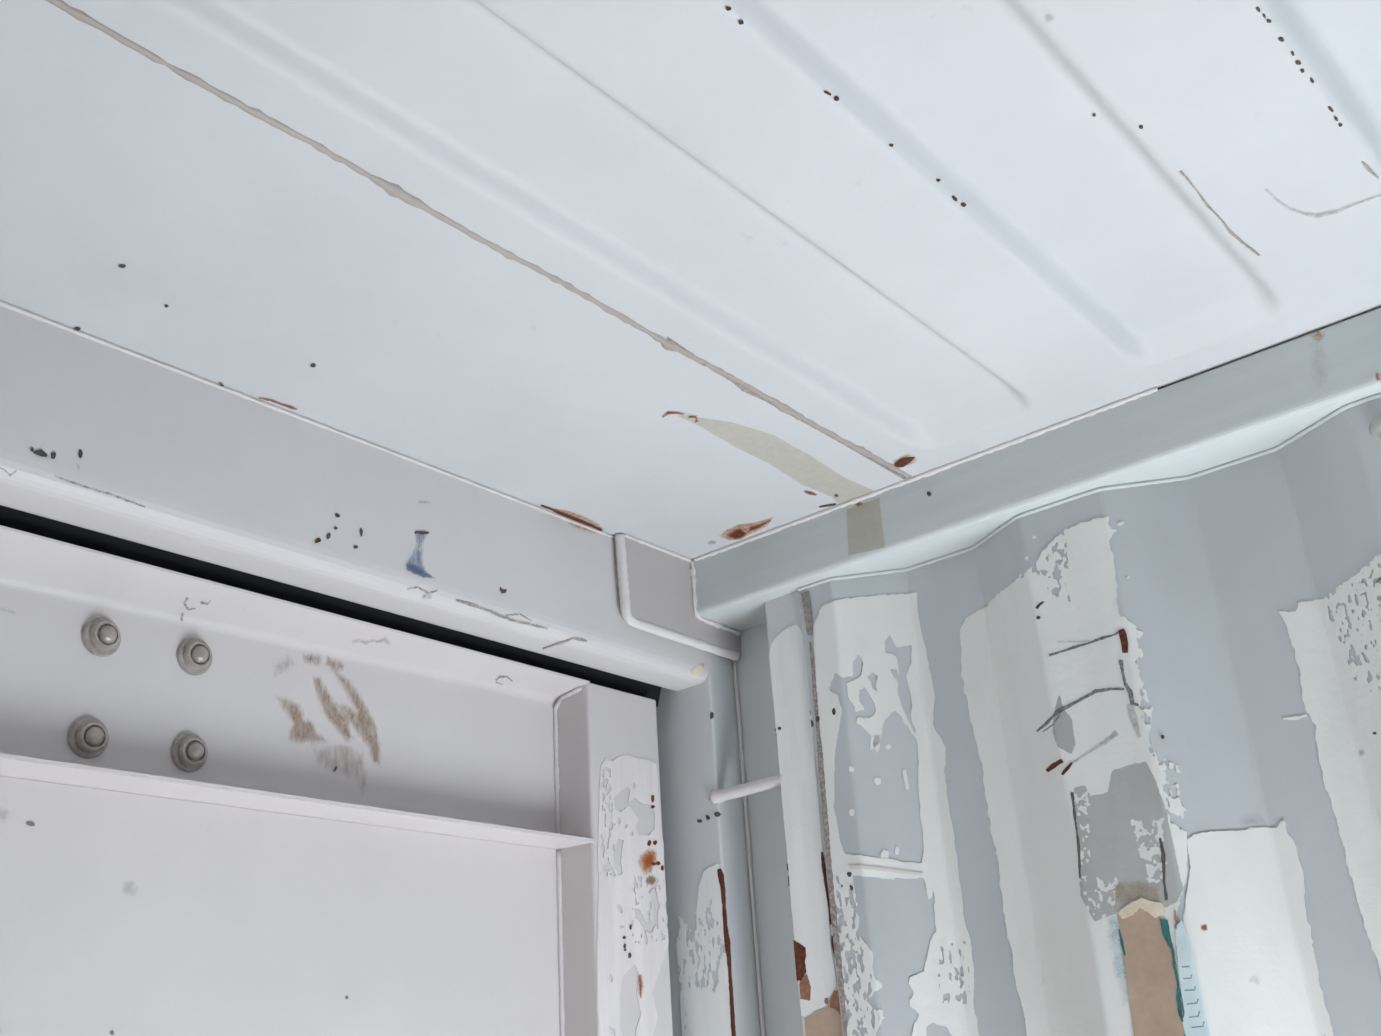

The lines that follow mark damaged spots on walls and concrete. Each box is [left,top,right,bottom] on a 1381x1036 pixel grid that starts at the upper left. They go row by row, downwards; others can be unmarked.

rust [724,519,770,540]
damp [290,705,315,739]
damp [318,664,379,761]
rust [641,840,664,884]
peeling [596,754,732,1036]
peeling [769,592,980,1036]
peeling [959,517,1334,1036]
peeling [1279,554,1381,975]